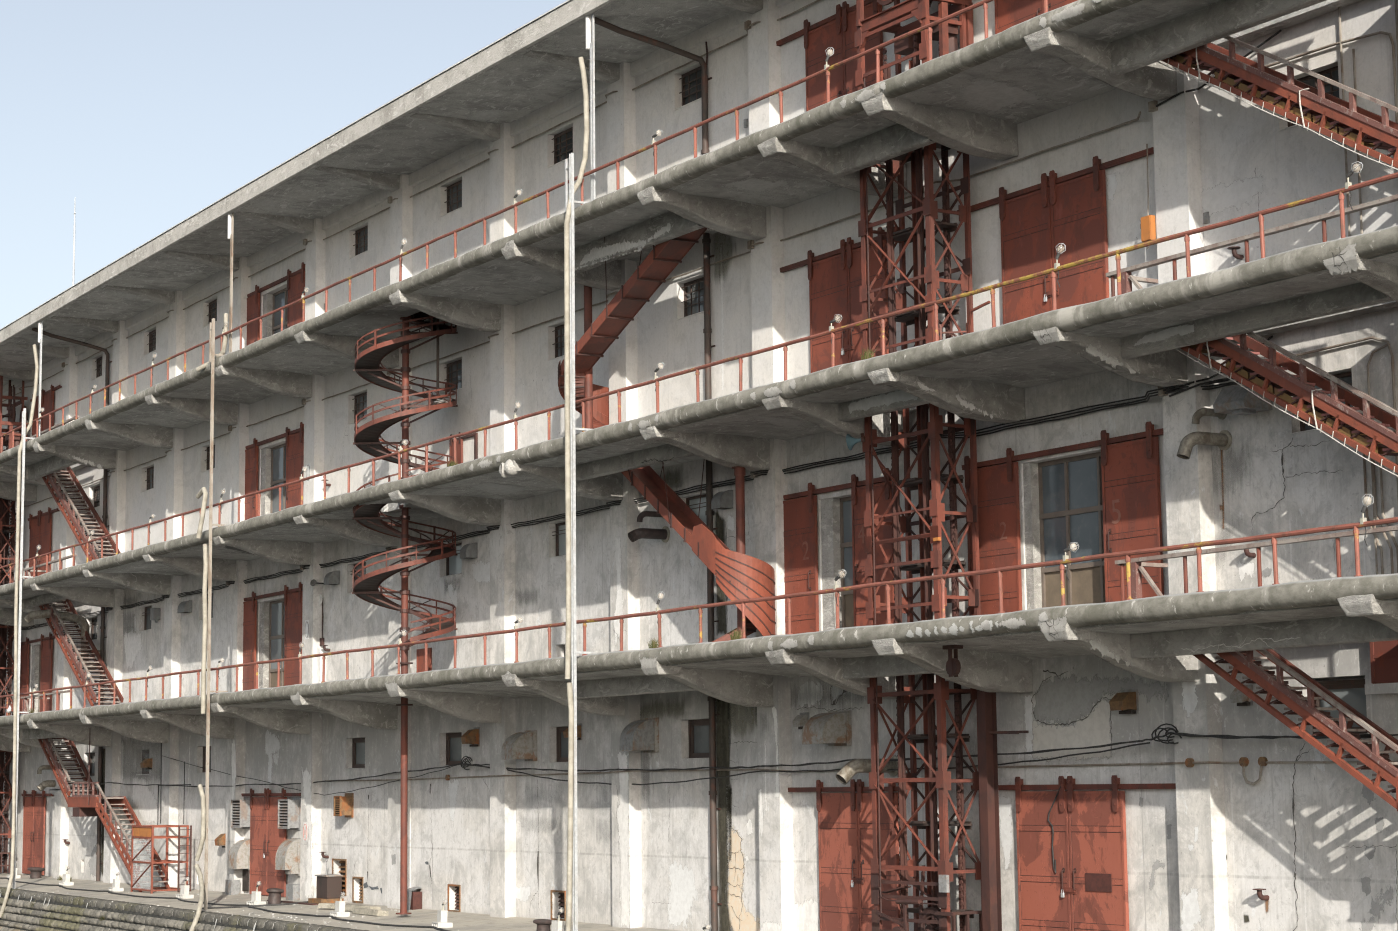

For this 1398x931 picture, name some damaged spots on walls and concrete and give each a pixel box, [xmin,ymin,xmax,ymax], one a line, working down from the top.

crack [1251,438,1342,529]
peeling [727,818,760,931]
crack [1292,744,1309,931]
peeling [1361,784,1385,860]
peeling [1361,877,1393,931]